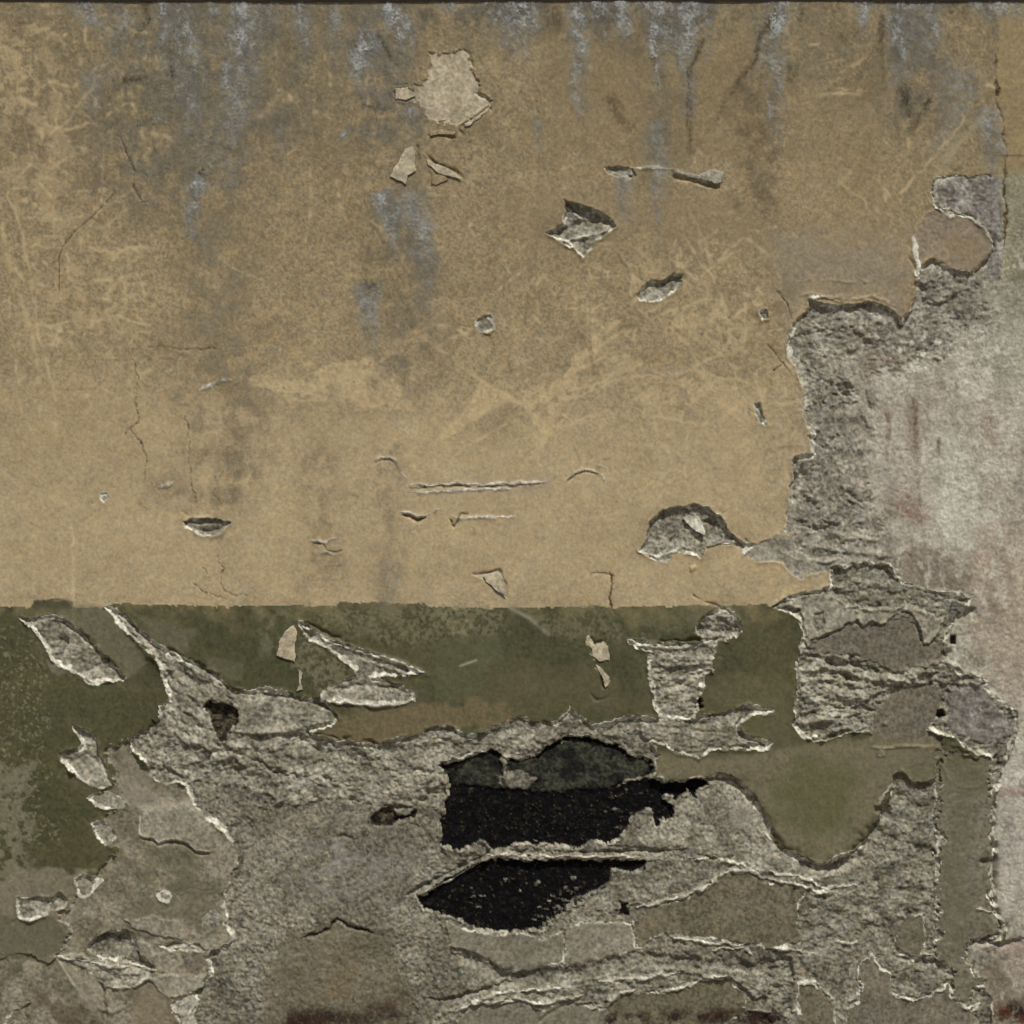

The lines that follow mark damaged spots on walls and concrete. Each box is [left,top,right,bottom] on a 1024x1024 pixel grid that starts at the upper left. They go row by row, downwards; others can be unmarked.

damp [74,1,272,265]
damp [330,1,418,143]
peeling [394,50,493,137]
damp [421,1,715,116]
damp [740,1,790,117]
damp [887,1,955,66]
crack [58,137,136,291]
spalling [547,203,617,259]
crack [124,422,148,465]
spalling [184,518,231,537]
peeling [637,175,1024,1024]
spalling [0,606,1008,1024]